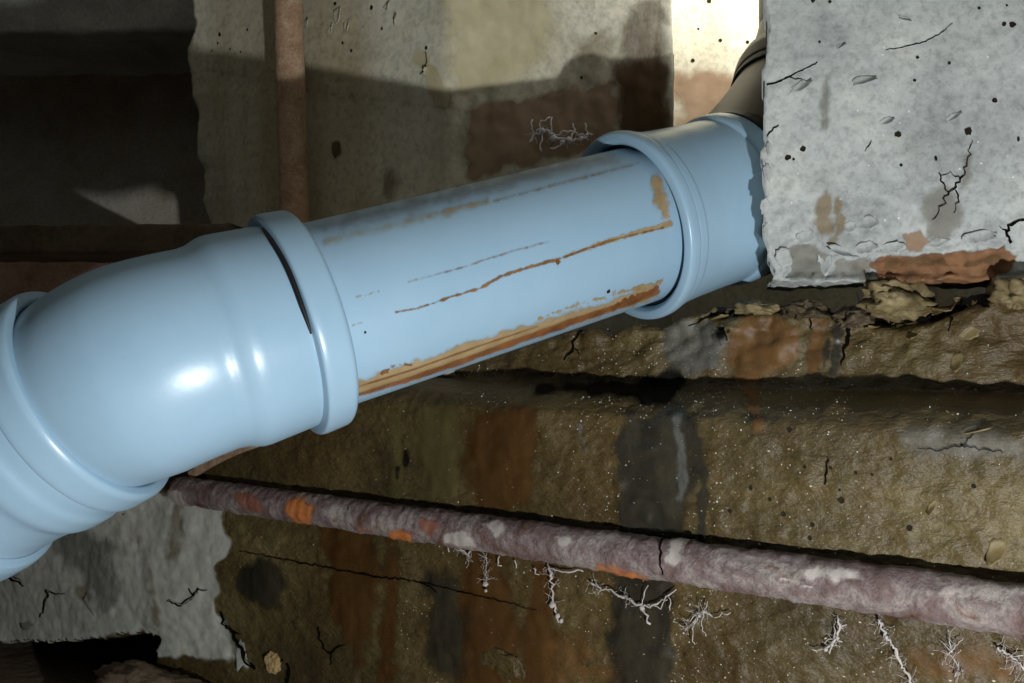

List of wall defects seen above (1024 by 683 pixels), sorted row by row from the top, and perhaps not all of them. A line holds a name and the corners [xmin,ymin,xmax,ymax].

crack [767,62,818,86]
crack [932,140,973,220]
crack [1000,219,1024,244]
rust [866,232,1016,286]
crack [564,329,583,361]
rust [727,315,827,432]
damp [535,368,709,542]
crack [918,428,1003,452]
crack [8,576,65,617]
crack [166,588,207,607]
crack [239,551,534,610]
damp [607,573,675,683]